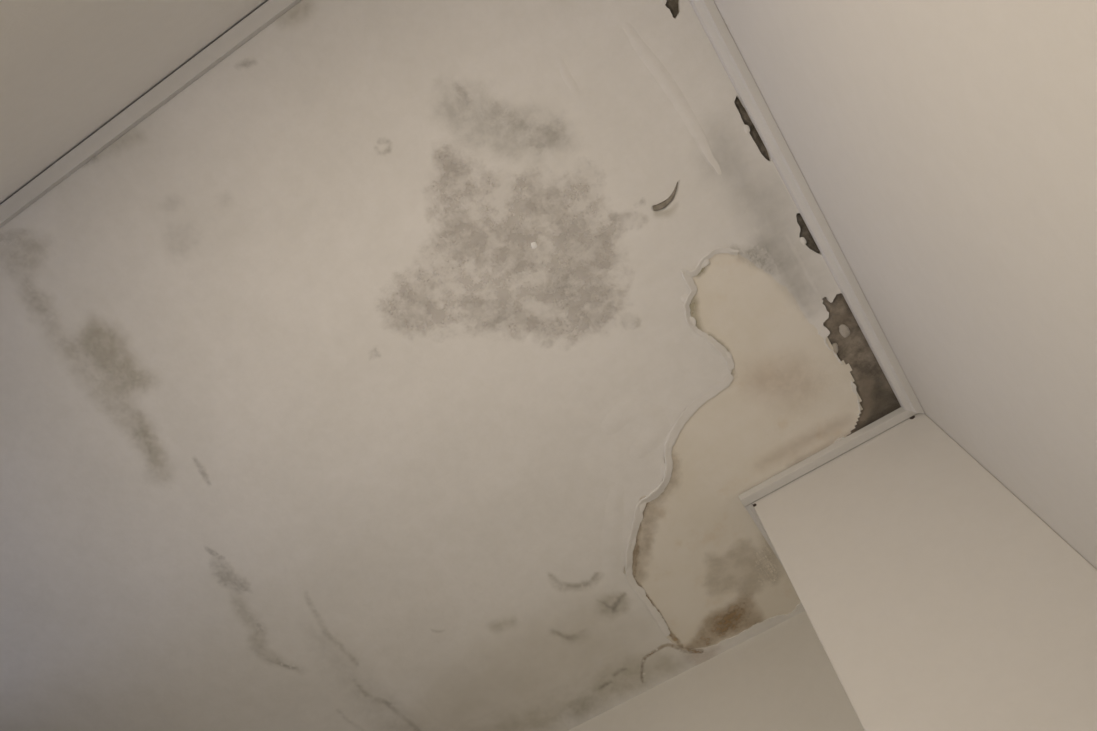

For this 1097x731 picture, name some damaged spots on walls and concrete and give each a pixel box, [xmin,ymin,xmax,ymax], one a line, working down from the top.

flaking render [660,0,679,18]
flaking render [734,96,770,161]
peeling [653,182,678,211]
flaking render [796,213,820,253]
flaking render [623,247,901,649]